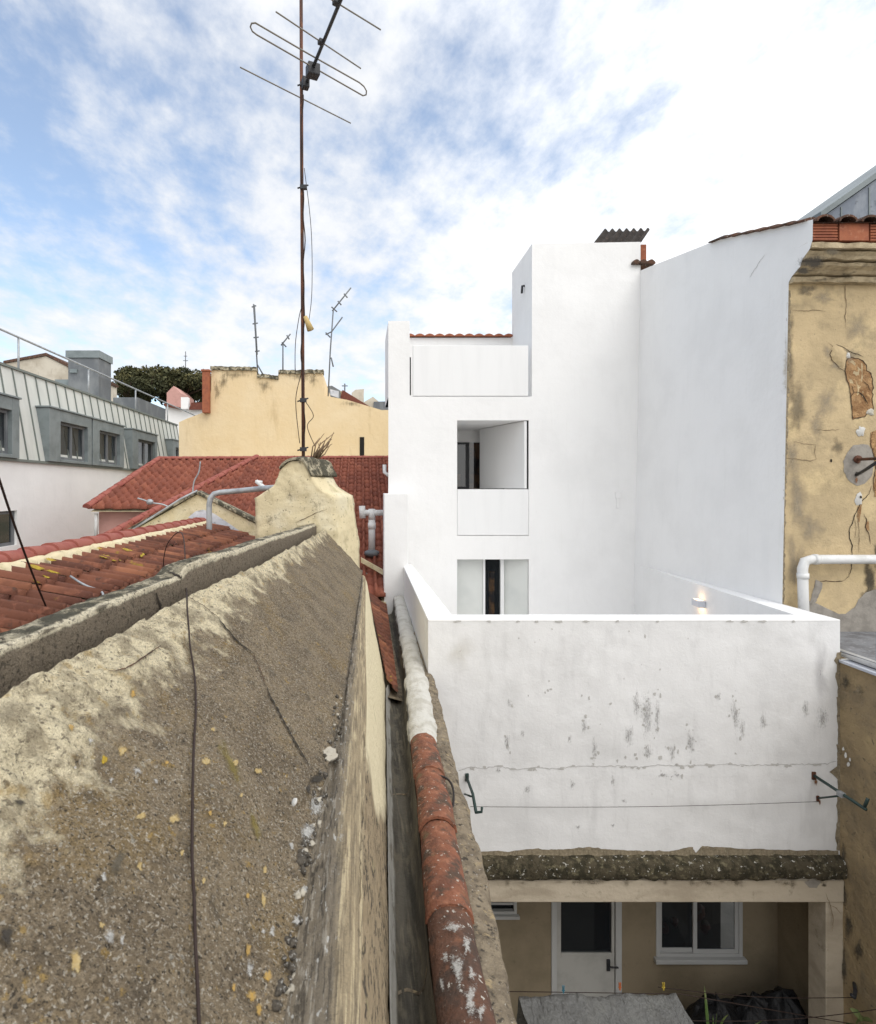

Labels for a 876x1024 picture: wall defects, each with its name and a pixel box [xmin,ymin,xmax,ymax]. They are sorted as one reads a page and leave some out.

water stain [797,249,838,274]
spalling [845,352,874,420]
crack [820,486,872,582]
crack [156,571,312,767]
crack [459,761,836,771]